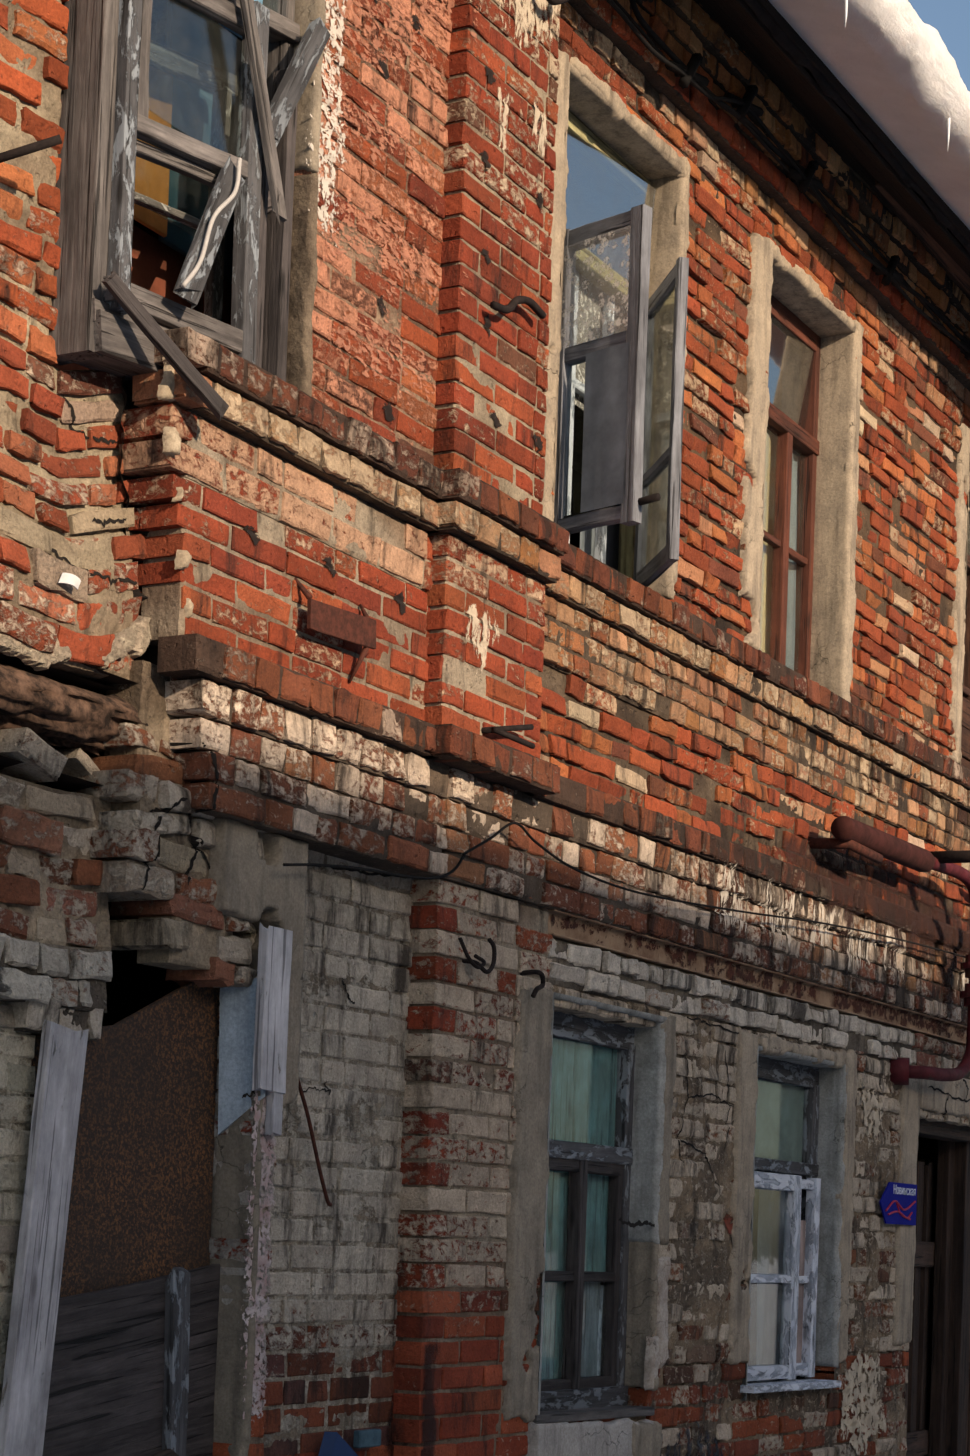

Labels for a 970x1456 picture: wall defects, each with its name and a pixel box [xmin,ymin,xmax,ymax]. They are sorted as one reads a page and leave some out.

spalling [470,65,496,84]
spalling [467,151,491,174]
peeling [305,0,454,424]
spalling [533,433,545,453]
spalling [58,573,81,590]
spalling [82,663,136,686]
spalling [0,727,102,792]
crack [929,1079,970,1120]
peeling [239,1090,276,1421]
flaking render [525,1418,662,1456]